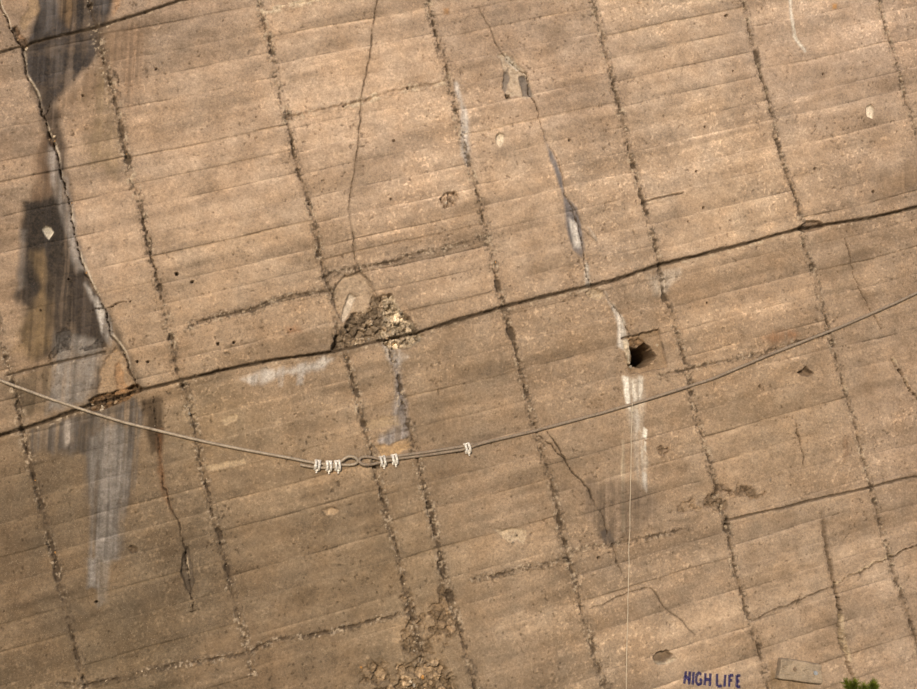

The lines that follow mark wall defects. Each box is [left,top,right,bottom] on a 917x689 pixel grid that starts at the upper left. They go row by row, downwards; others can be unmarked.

water stain [6,0,161,419]
crack [0,0,697,689]
spalling [335,273,425,351]
crack [587,0,917,689]
water stain [30,393,167,611]
water stain [570,374,665,555]
spalling [356,655,460,689]